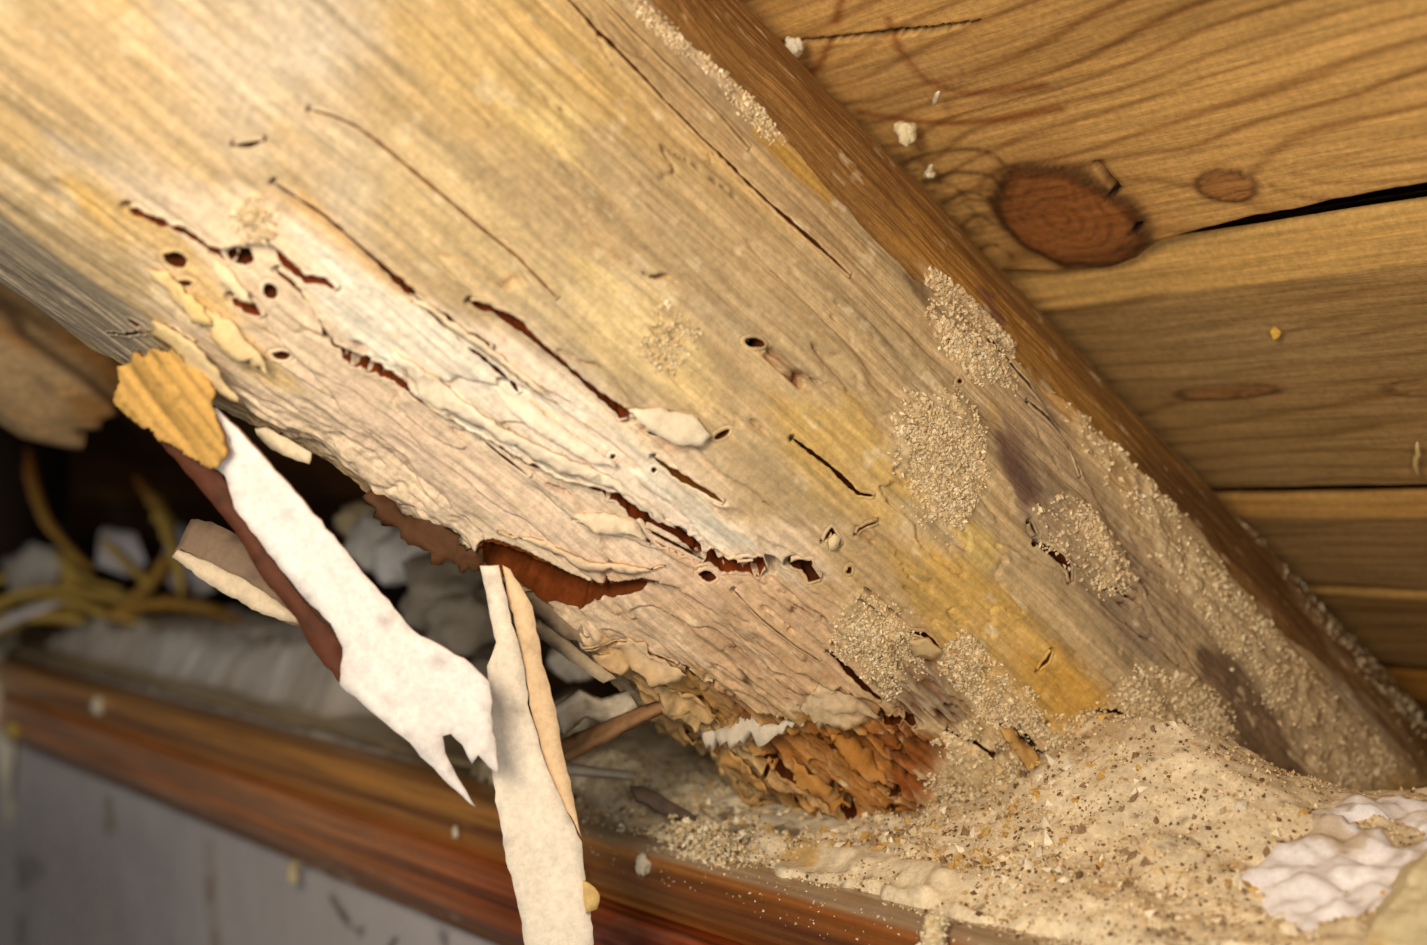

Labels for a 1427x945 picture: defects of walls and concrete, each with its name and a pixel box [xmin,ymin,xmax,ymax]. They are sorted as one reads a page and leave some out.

peeling [207,252,254,303]
crack [105,324,195,342]
peeling [144,266,270,406]
peeling [391,293,676,542]
crack [128,105,1045,761]
peeling [627,407,711,450]
peeling [496,530,666,575]
peeling [827,534,840,551]
peeling [591,637,888,813]